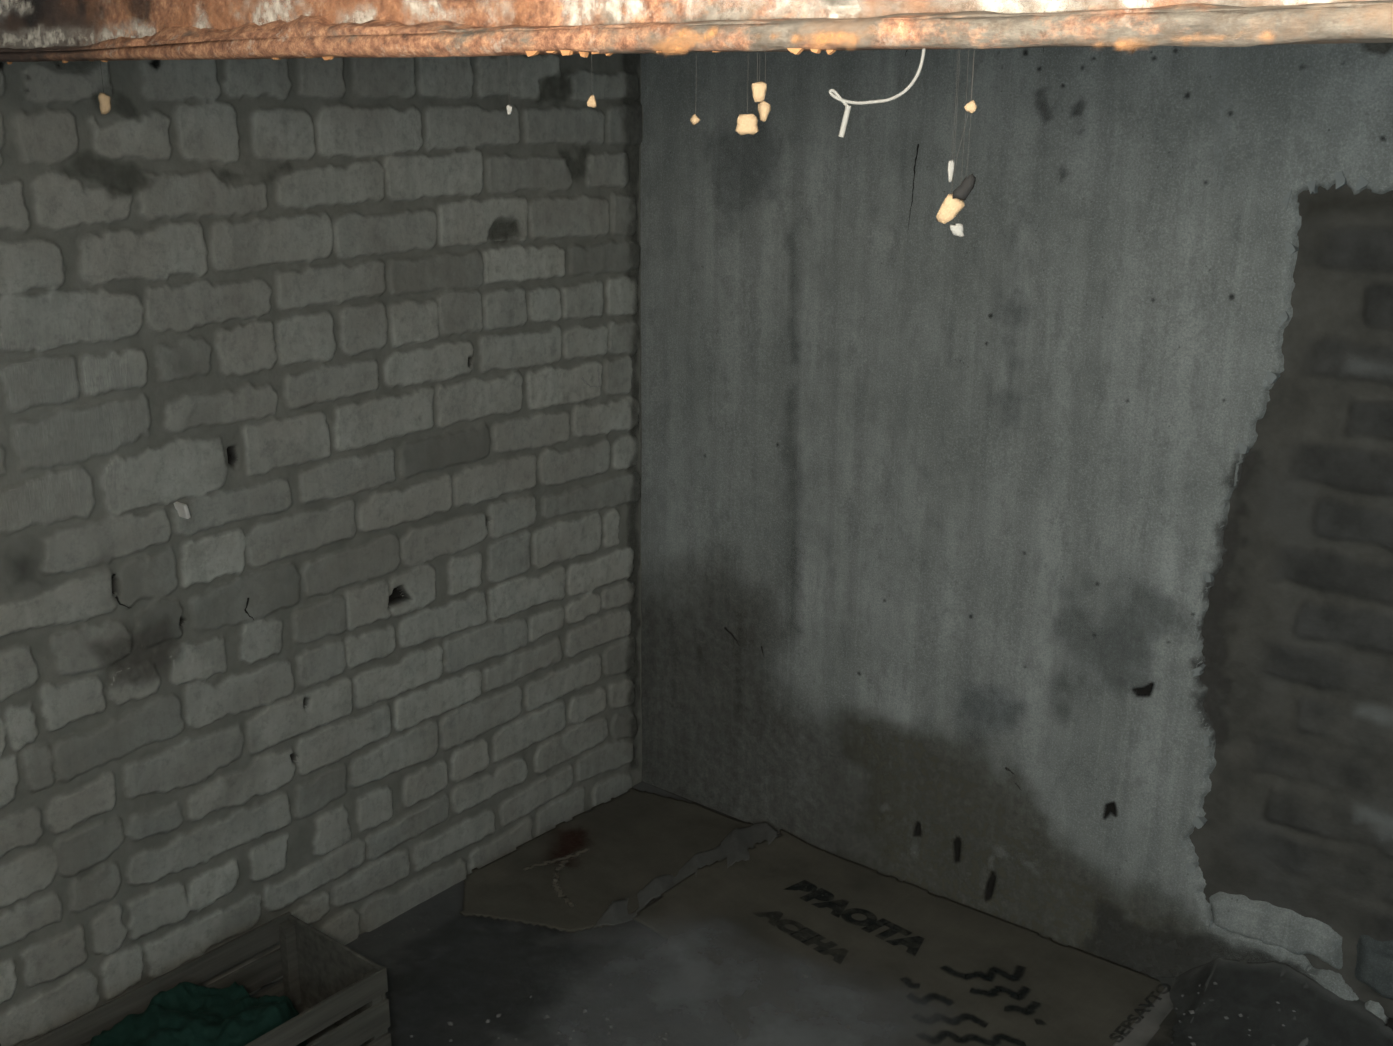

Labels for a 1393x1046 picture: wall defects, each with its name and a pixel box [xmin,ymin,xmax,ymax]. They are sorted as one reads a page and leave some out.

rust [656,29,721,53]
rust [787,33,856,55]
damp [624,54,642,360]
damp [626,459,1313,981]
flaking render [1186,171,1393,1031]